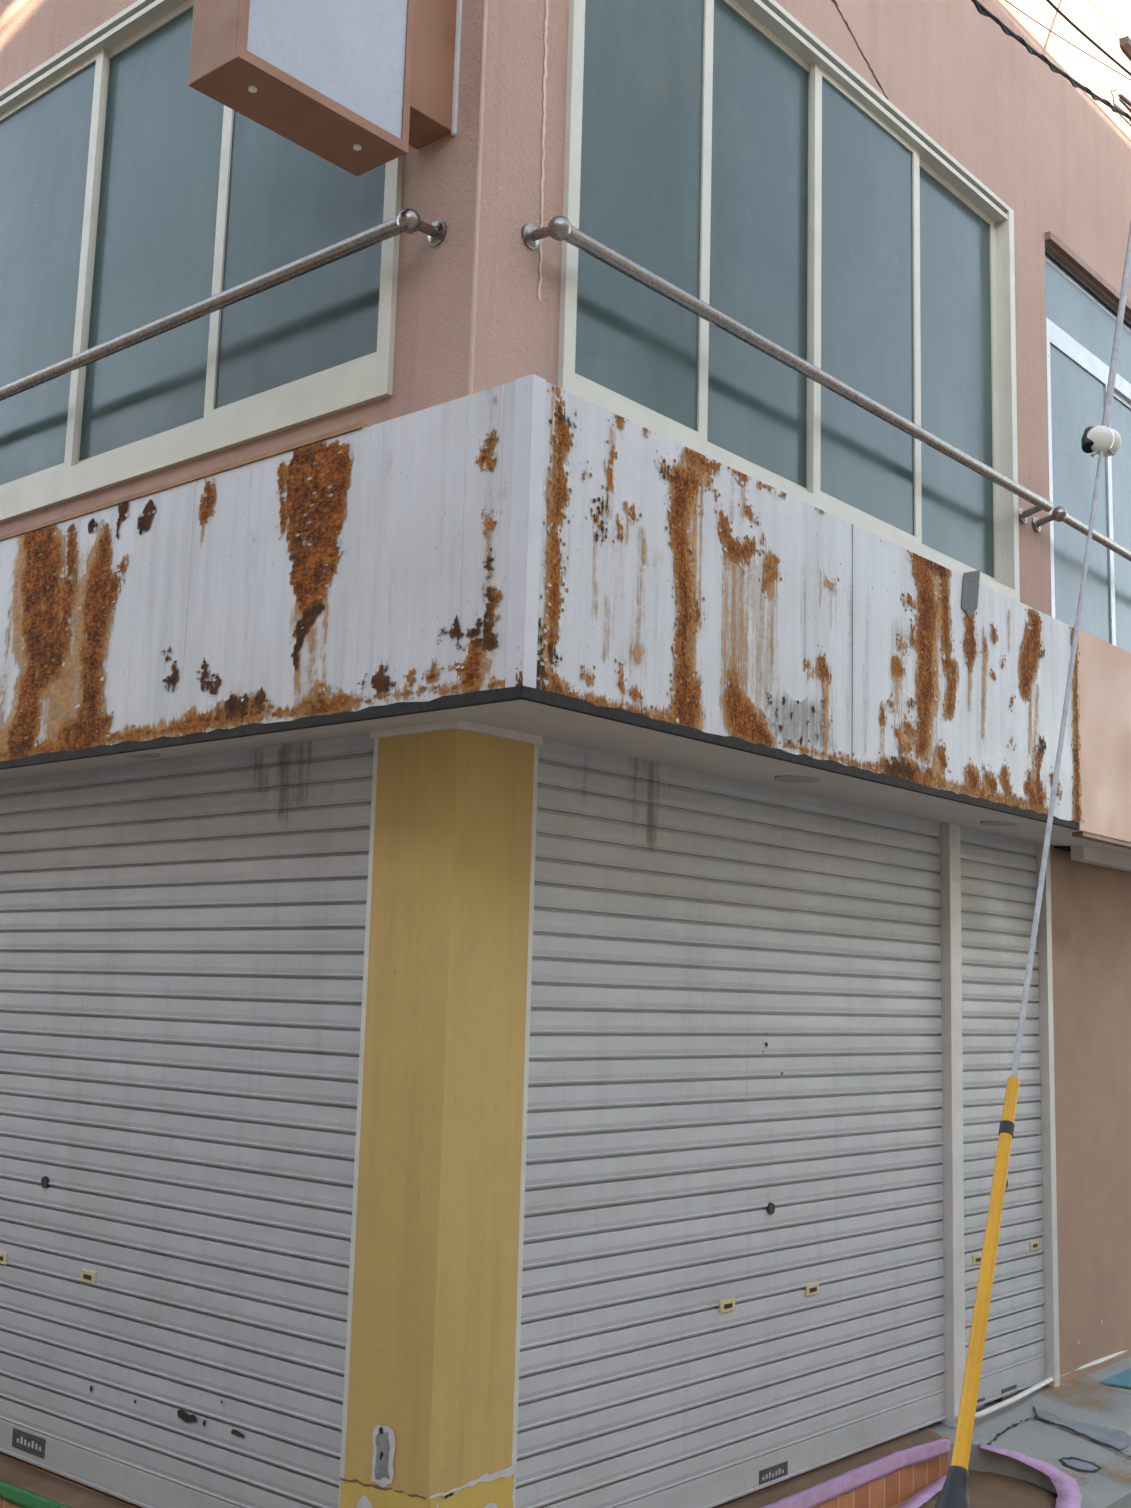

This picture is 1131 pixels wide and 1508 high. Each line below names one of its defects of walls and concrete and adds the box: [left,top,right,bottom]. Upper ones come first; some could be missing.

corrosion [0,385,1084,823]
peeling [340,1424,514,1508]